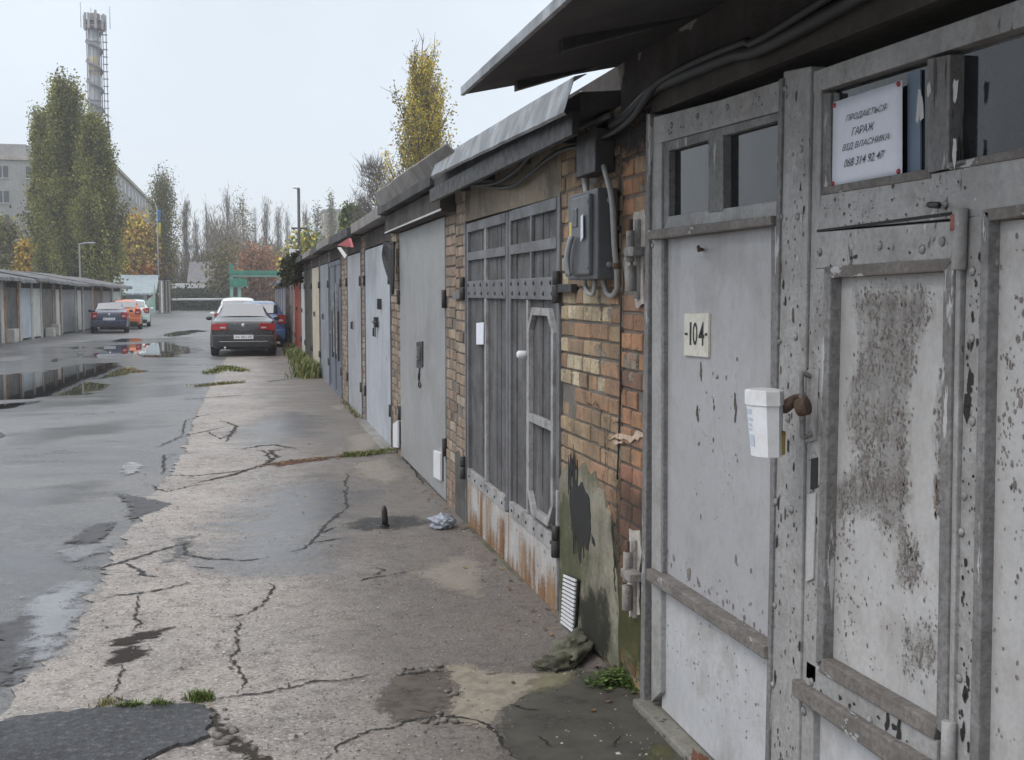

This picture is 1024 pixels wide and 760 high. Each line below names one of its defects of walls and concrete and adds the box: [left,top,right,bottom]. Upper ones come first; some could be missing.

peeling [962,338,979,431]
crack [147,395,299,491]
peeling [835,277,938,694]
peeling [932,368,942,519]
crack [76,455,368,631]
rust [467,491,557,614]
crack [95,664,131,708]
crack [211,582,368,698]
crack [319,710,512,760]
peeling [375,663,687,760]
leakage [579,590,610,657]
peeling [958,639,972,753]